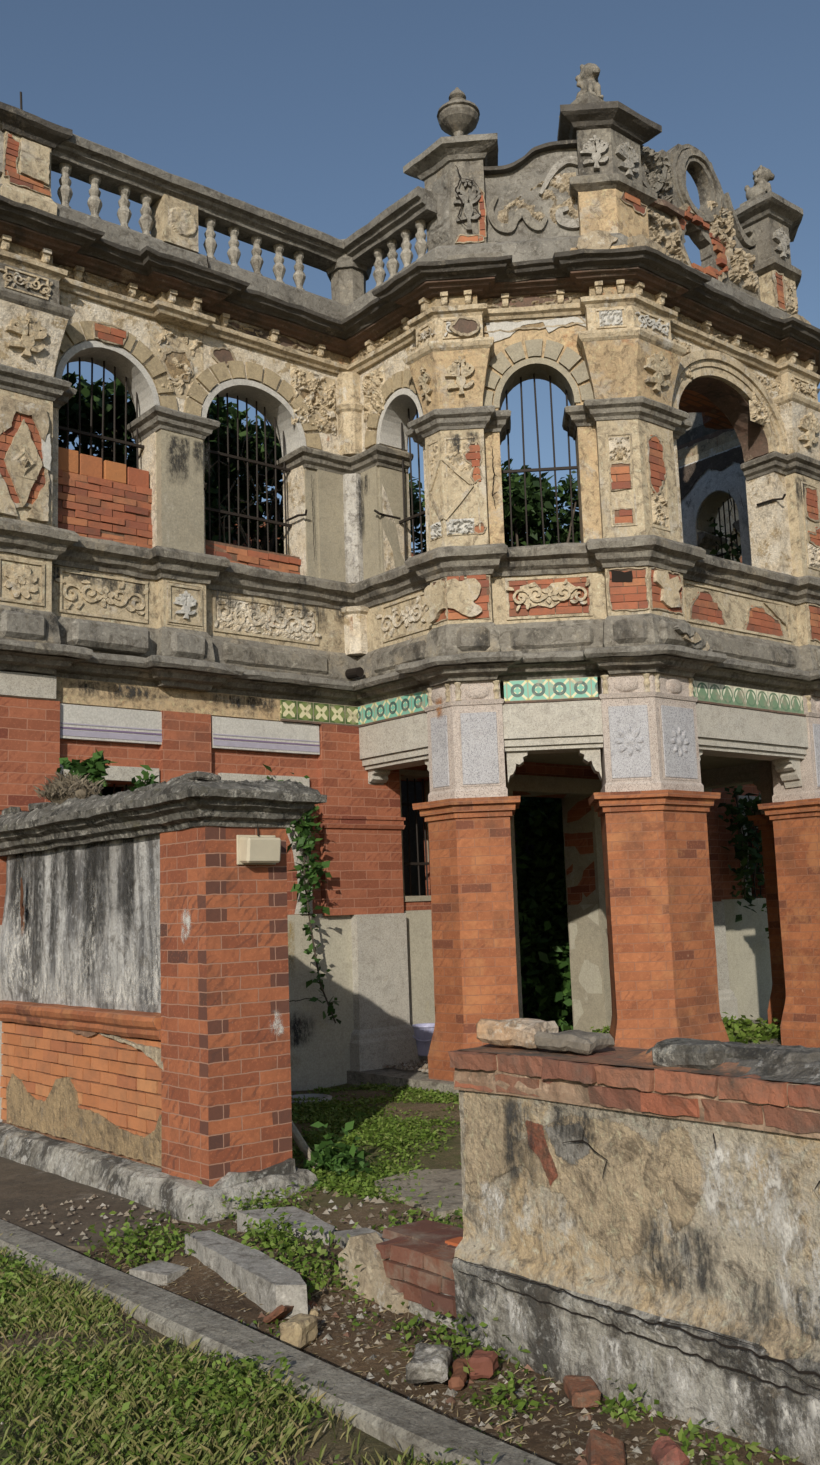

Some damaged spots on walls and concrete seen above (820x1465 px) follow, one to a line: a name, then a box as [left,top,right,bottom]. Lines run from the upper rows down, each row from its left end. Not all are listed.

peeling [3,131,52,197]
spalling [576,203,733,282]
peeling [432,567,784,637]
damp [4,838,160,1005]
damp [506,1102,534,1179]
damp [553,1105,593,1139]
peeling [463,1091,707,1261]
damp [452,1266,526,1333]
crack [452,1257,820,1400]
damp [600,1339,695,1393]
damp [642,1223,716,1292]
damp [692,1147,820,1445]